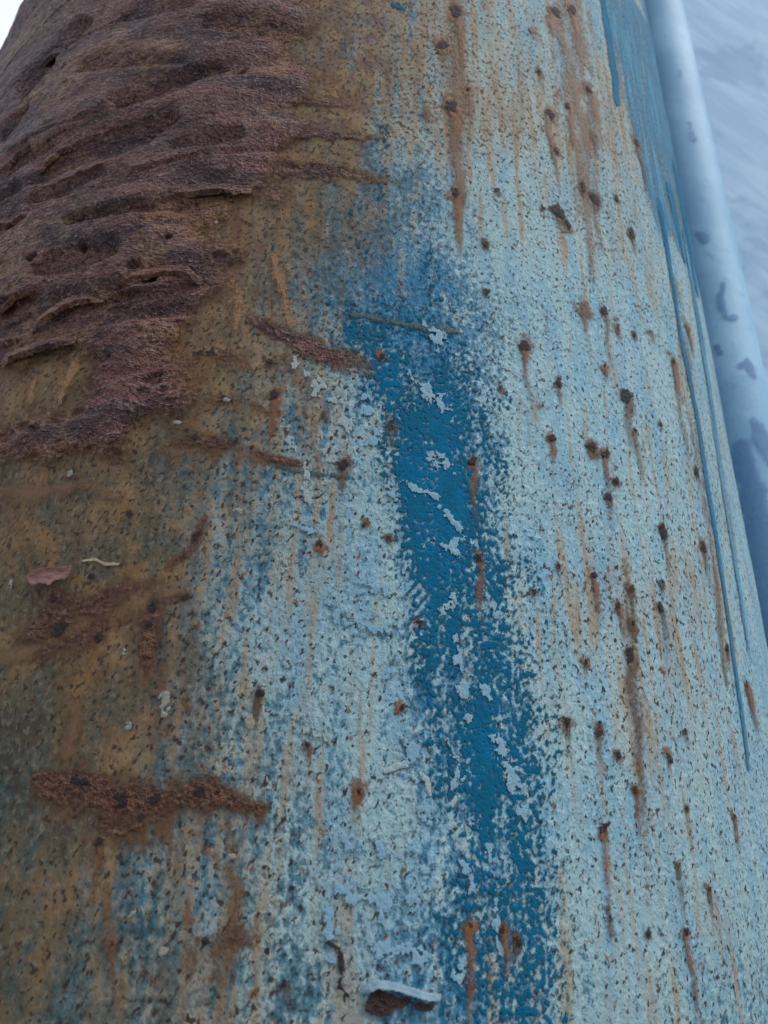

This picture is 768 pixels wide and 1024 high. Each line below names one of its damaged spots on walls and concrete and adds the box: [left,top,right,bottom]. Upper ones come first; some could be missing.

corrosion [0,0,388,467]
peeling [278,418,315,508]
corrosion [422,0,476,252]
corrosion [536,0,602,282]
corrosion [586,438,622,513]
corrosion [574,300,655,340]
corrosion [621,388,643,467]
peeling [284,197,589,1024]
corrosion [595,720,624,763]
corrosion [614,559,648,834]
corrosion [30,765,270,993]
corrosion [599,821,614,940]